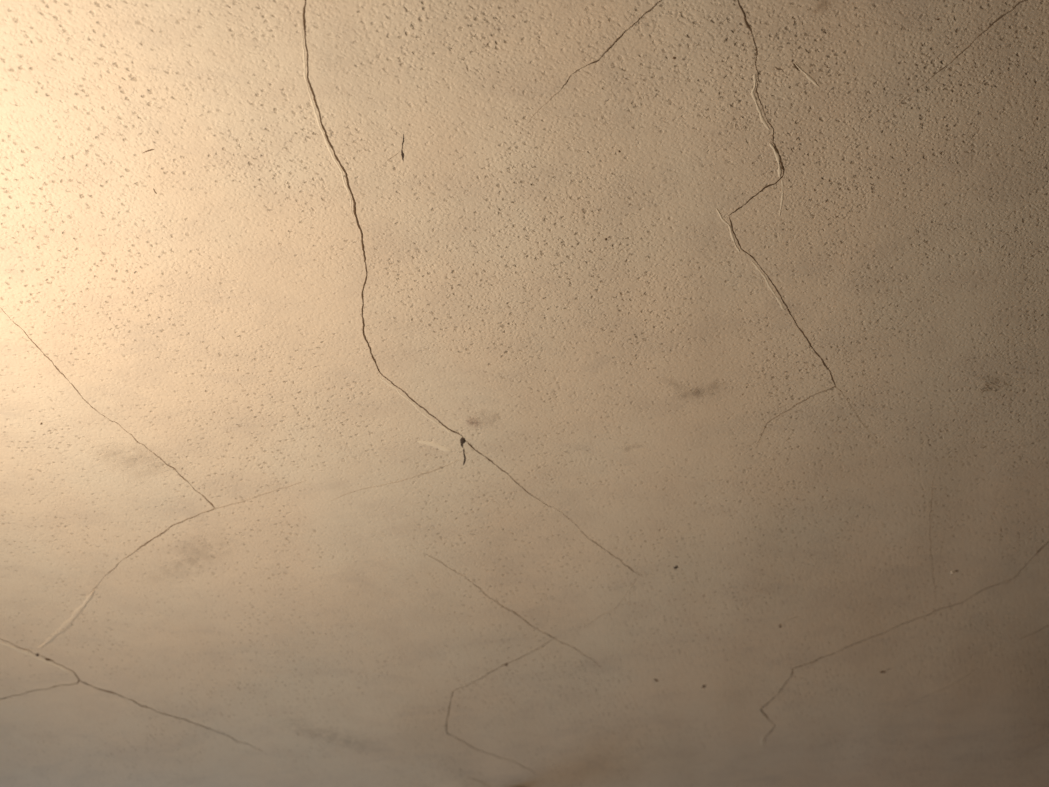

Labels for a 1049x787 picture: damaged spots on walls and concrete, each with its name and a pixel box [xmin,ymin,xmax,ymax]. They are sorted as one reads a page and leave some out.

crack [302,0,662,576]
crack [716,0,875,445]
crack [891,0,1027,111]
crack [1,311,304,749]
crack [428,555,600,773]
crack [760,542,1048,746]